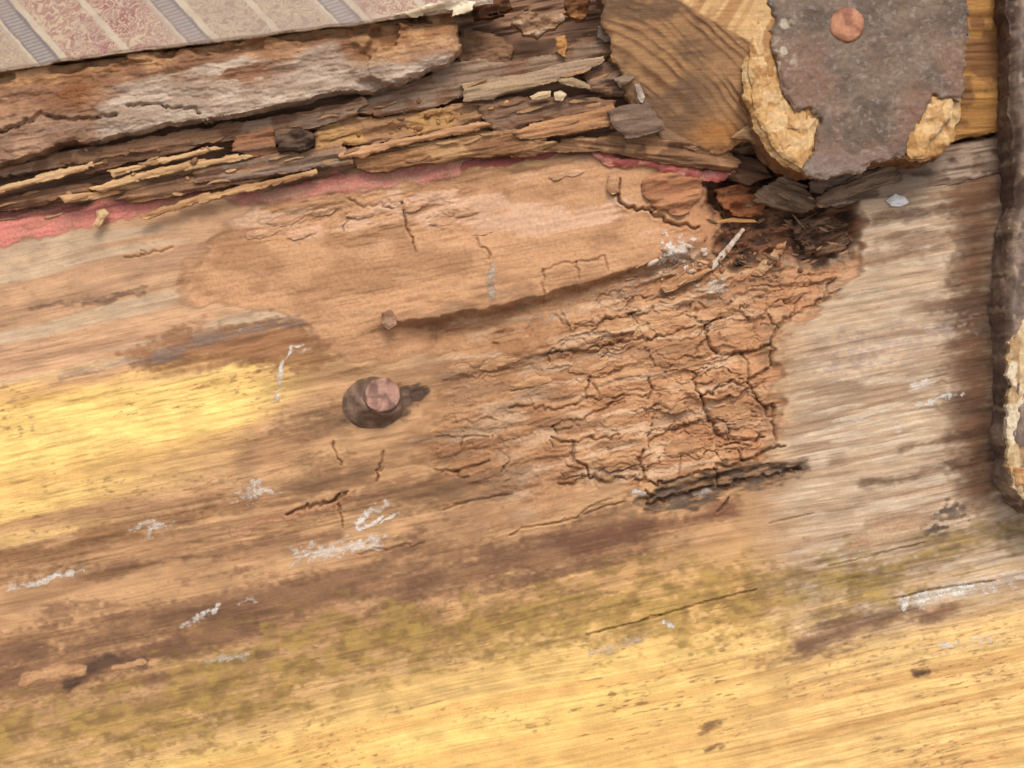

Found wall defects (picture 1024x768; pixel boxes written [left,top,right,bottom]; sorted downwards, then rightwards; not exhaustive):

spalling [747,15,820,169]
spalling [905,95,954,160]
peeling [0,192,206,248]
peeling [224,153,578,206]
corrosion [399,384,430,418]
crack [547,313,655,362]
crack [642,372,725,453]
crack [705,283,829,442]
damp [916,176,1002,556]
damp [0,480,274,561]
crack [648,469,763,505]
damp [0,502,810,749]